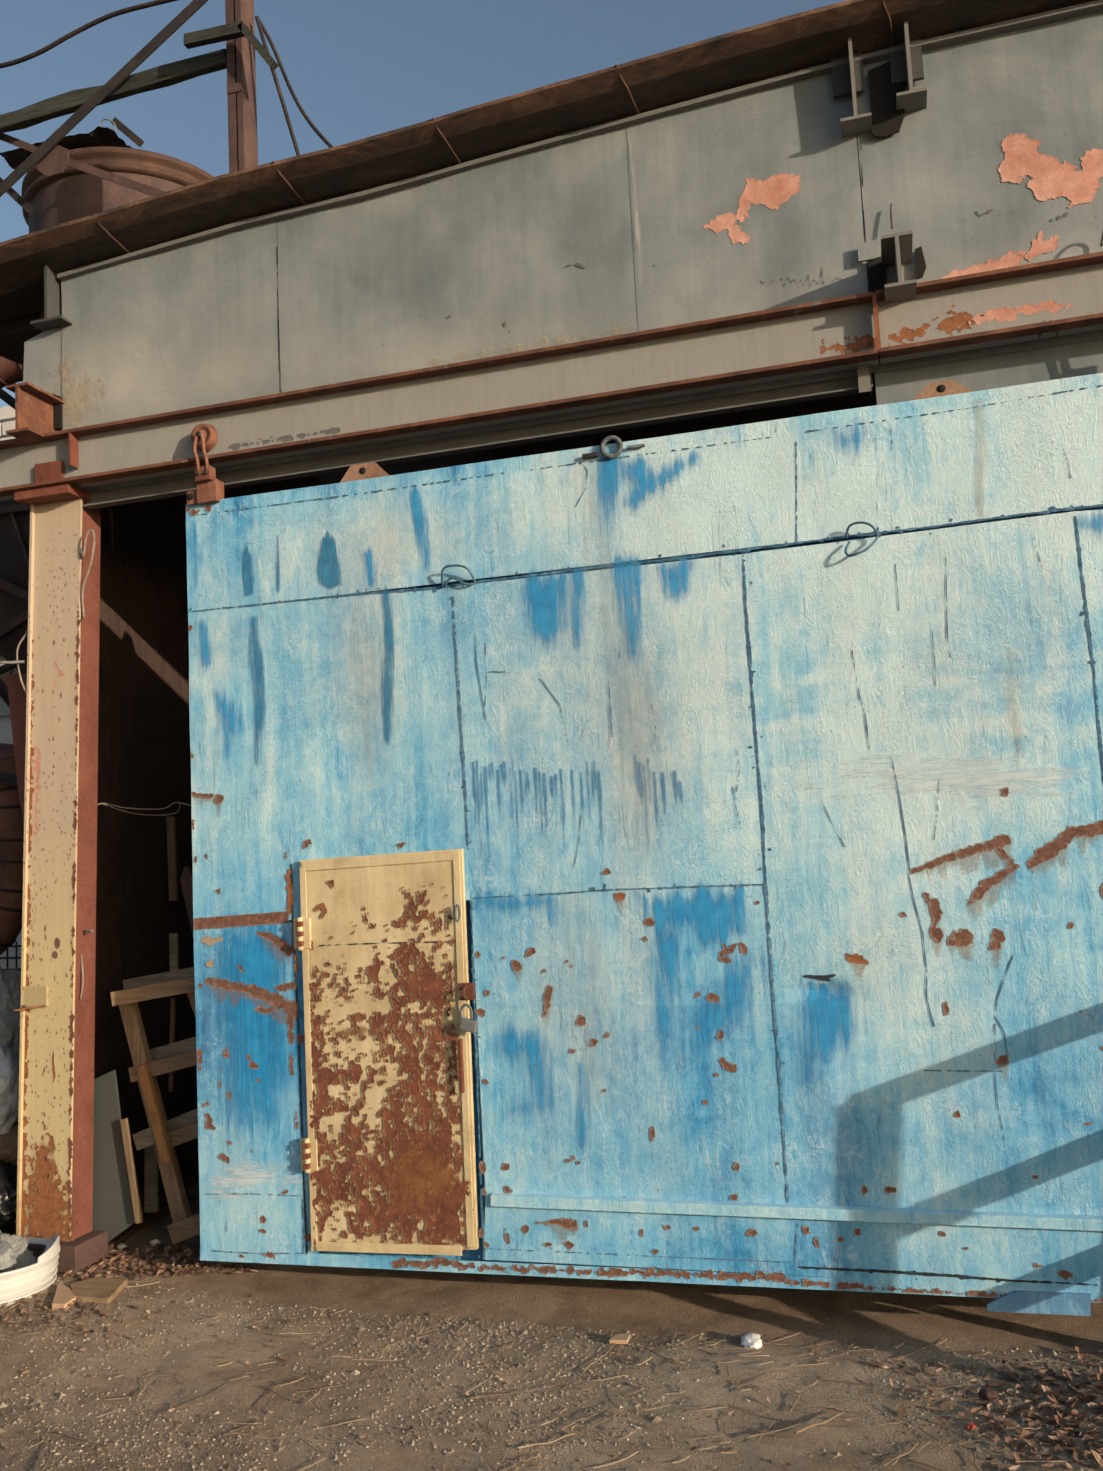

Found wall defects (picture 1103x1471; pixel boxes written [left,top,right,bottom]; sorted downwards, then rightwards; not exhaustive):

peeling [703,173,802,245]
peeling [941,133,1103,279]
peeling [967,300,1073,327]
rust [191,792,224,804]
rust [908,820,1103,905]
rust [19,605,81,1242]
rust [923,892,1006,951]
rust [511,947,536,972]
rust [845,953,868,965]
rust [204,977,299,1017]
rust [535,1217,578,1231]
rust [391,1256,1007,1298]